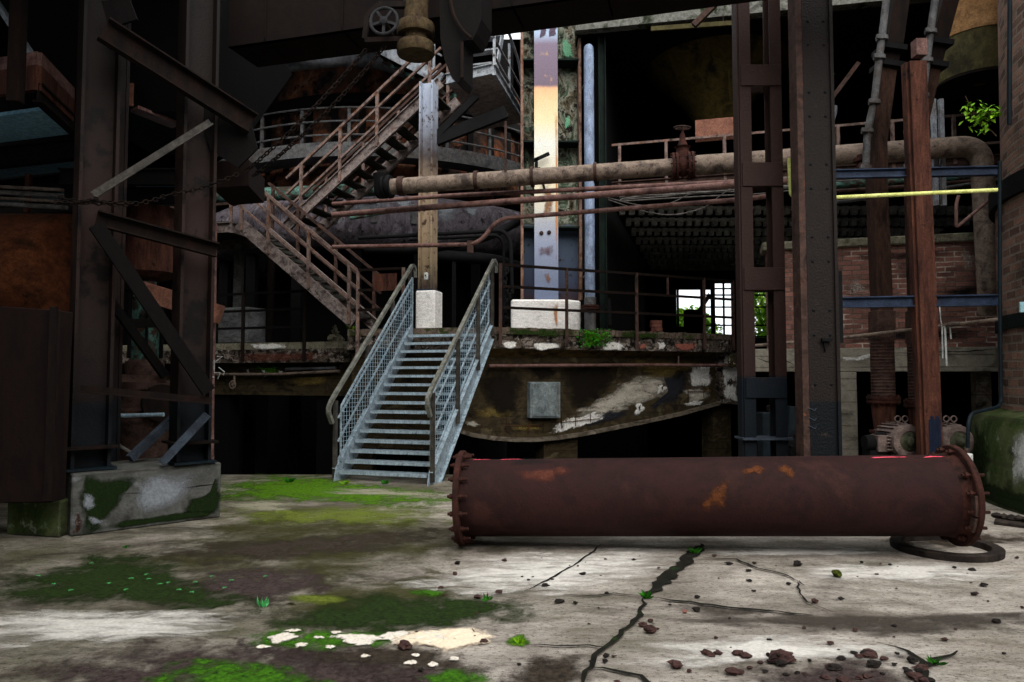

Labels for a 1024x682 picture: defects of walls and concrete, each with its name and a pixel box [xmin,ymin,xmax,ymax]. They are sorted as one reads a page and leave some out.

corrosion [544,184,558,237]
efflorescence [1013,436,1024,477]
damp [84,478,211,530]
crack [524,543,830,682]